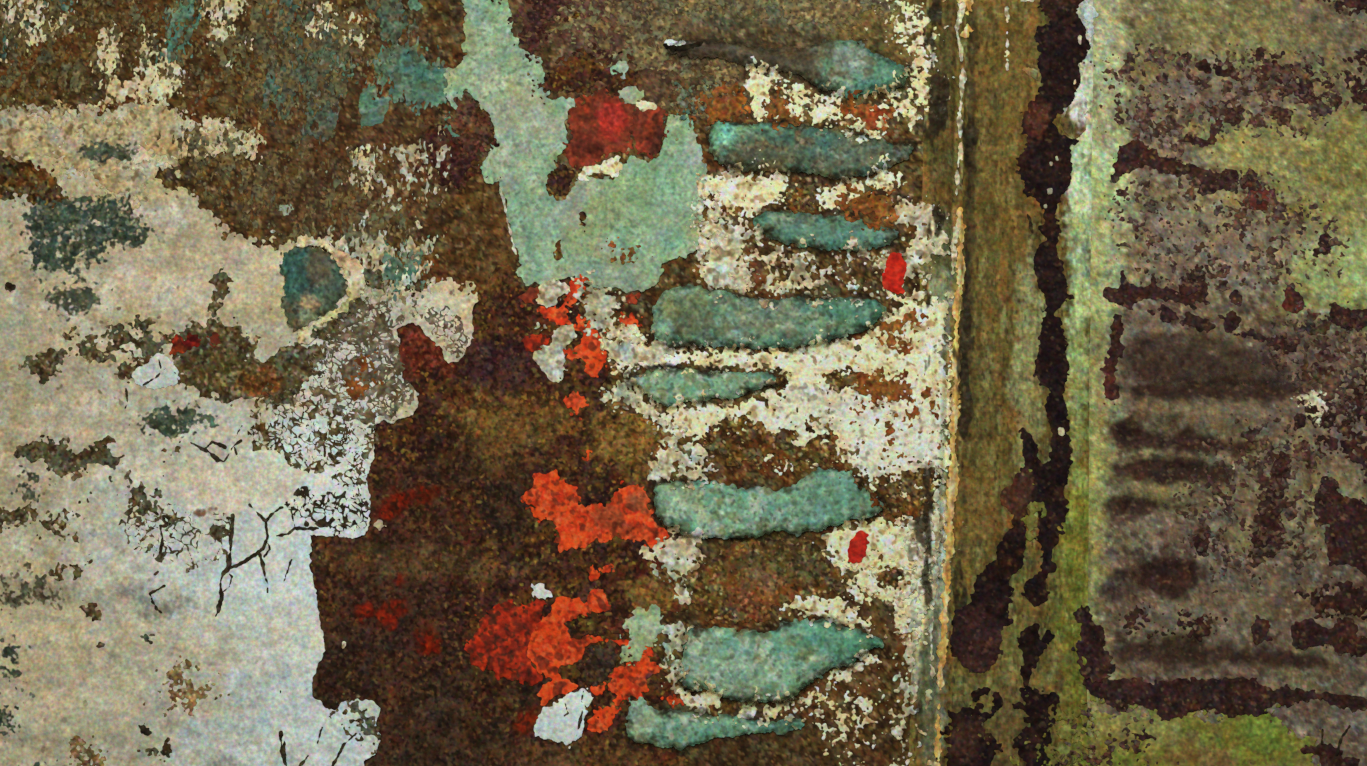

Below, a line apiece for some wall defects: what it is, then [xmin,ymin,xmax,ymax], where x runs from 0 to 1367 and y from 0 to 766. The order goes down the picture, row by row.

peeling [610,39,727,131]
corrosion [601,237,653,264]
peeling [132,353,180,390]
leakage [1116,378,1318,402]
crack [119,296,470,617]
leakage [1111,420,1257,485]
peeling [833,530,870,576]
leakage [1138,556,1198,599]
corrosion [564,609,629,686]
leakage [1113,637,1325,668]
corrosion [329,692,381,755]
peeling [784,686,869,757]